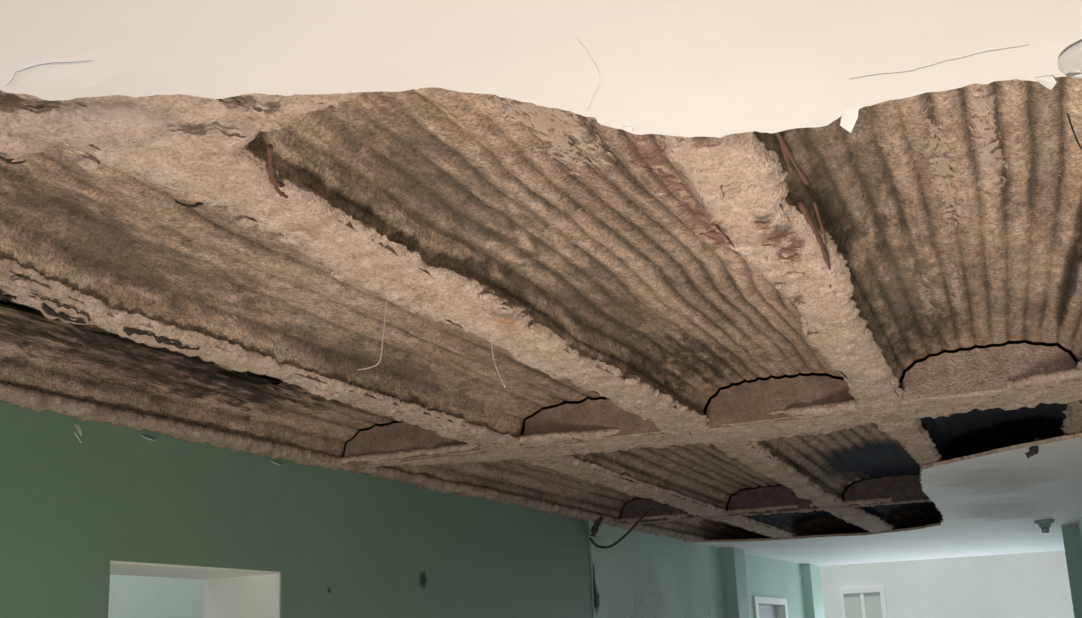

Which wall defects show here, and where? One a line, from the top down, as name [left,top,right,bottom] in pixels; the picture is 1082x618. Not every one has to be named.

flaking render [1034,75,1057,90]
spalling [0,92,73,114]
spalling [169,127,247,138]
spalling [216,99,281,115]
flaking render [840,106,859,133]
spalling [267,144,288,198]
spalling [774,132,809,185]
corrosion [629,135,730,251]
corrosion [753,219,805,265]
spalling [798,200,831,270]
spalling [1025,437,1041,458]
spalling [590,516,603,537]